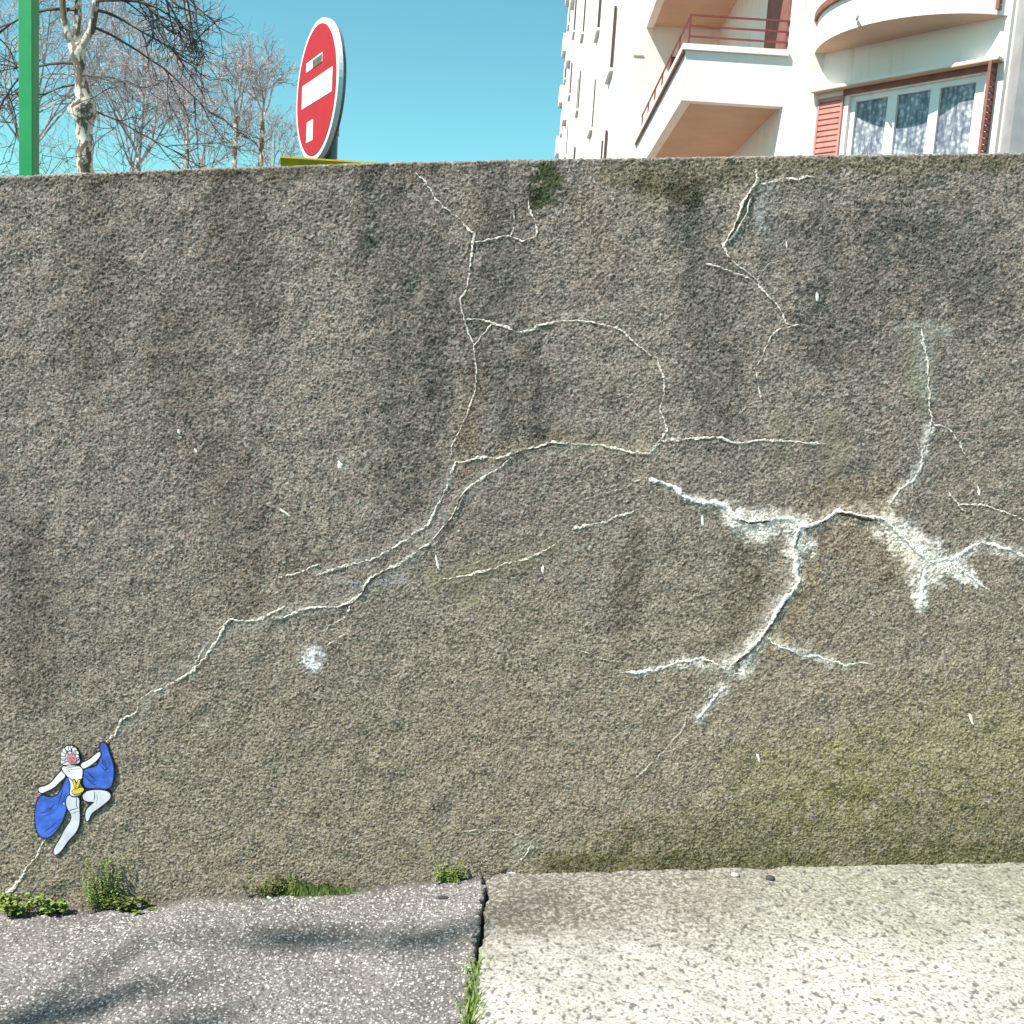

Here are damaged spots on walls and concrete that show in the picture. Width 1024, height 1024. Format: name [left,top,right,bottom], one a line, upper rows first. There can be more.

crack [80,169,1024,782]
leakage [643,427,1021,723]
crack [4,839,46,897]
crack [445,829,531,876]